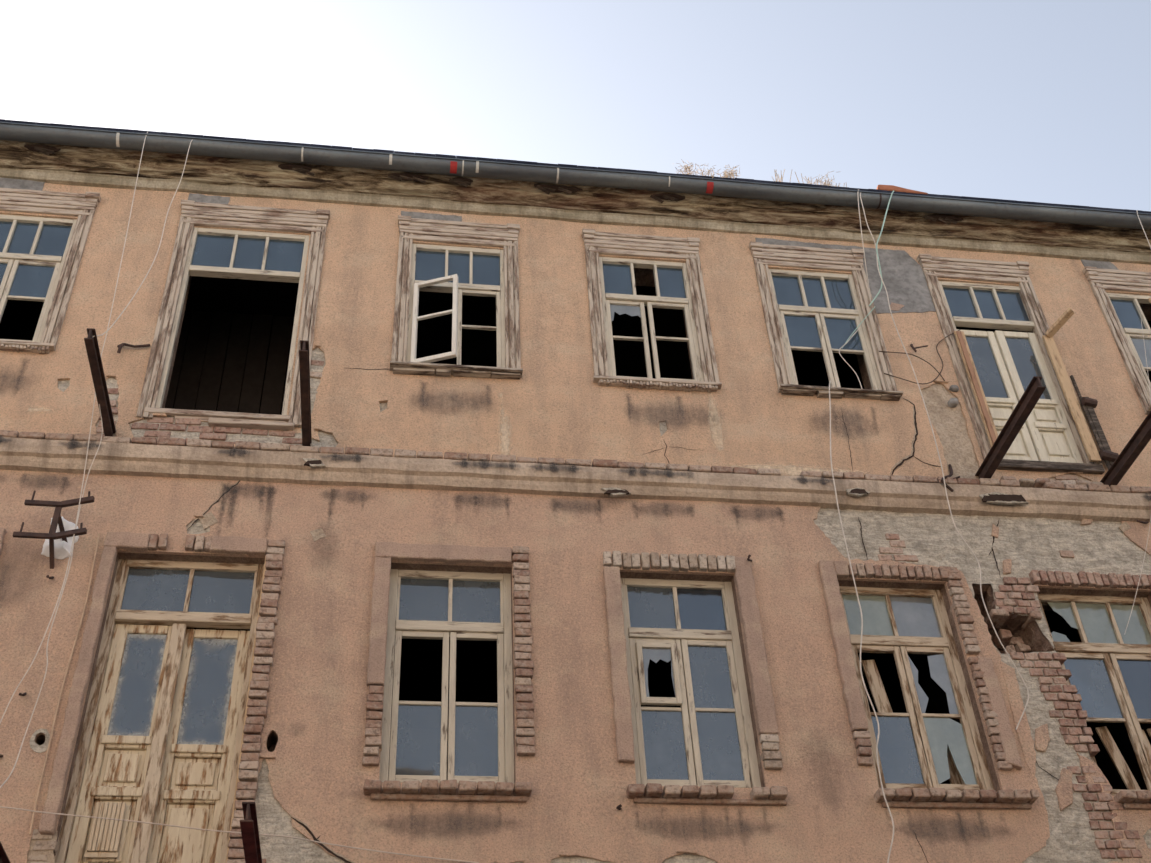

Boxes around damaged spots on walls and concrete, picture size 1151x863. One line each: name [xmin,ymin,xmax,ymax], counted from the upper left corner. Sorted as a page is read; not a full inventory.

spalling [310,343,325,413]
spalling [96,373,338,466]
crack [889,397,941,477]
crack [186,480,241,530]
spalling [982,487,1032,502]
spalling [1049,472,1089,482]
spalling [813,508,1151,863]